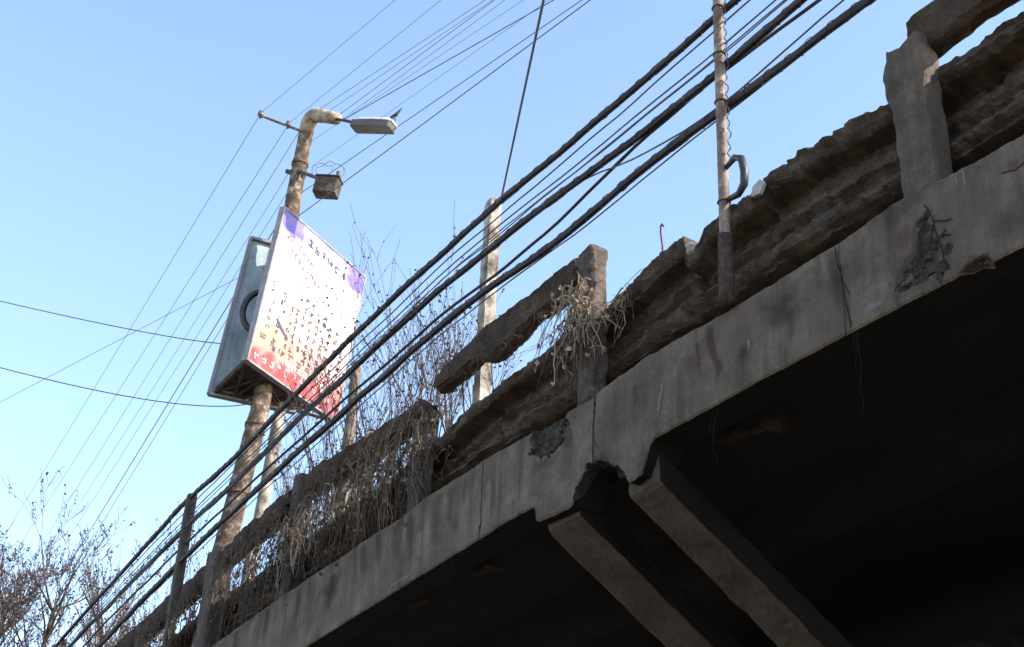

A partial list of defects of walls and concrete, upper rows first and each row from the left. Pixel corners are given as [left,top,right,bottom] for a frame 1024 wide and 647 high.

spalling [893,203,994,293]
spalling [528,419,571,465]